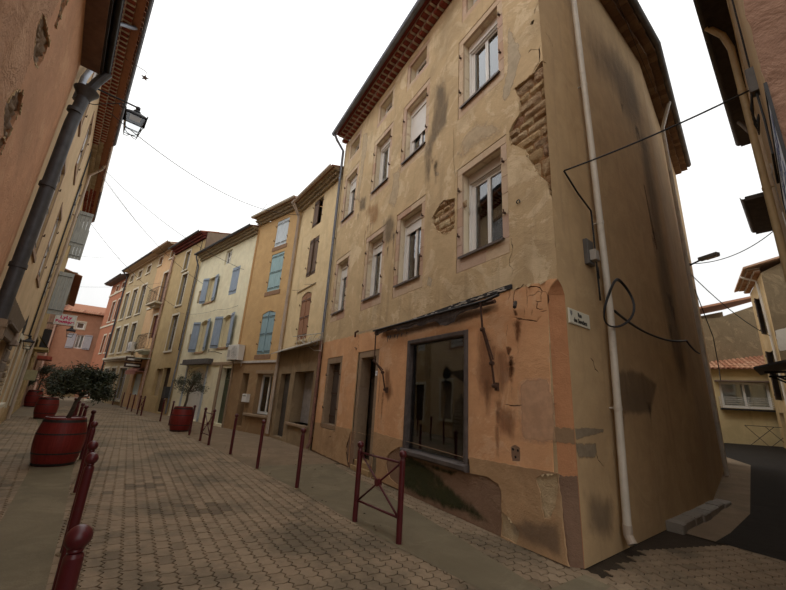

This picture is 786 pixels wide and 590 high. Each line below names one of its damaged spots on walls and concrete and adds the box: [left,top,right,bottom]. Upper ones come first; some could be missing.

flaking render [33,0,69,69]
flaking render [0,89,24,155]
flaking render [510,63,552,196]
flaking render [432,199,467,234]
crack [488,284,549,341]